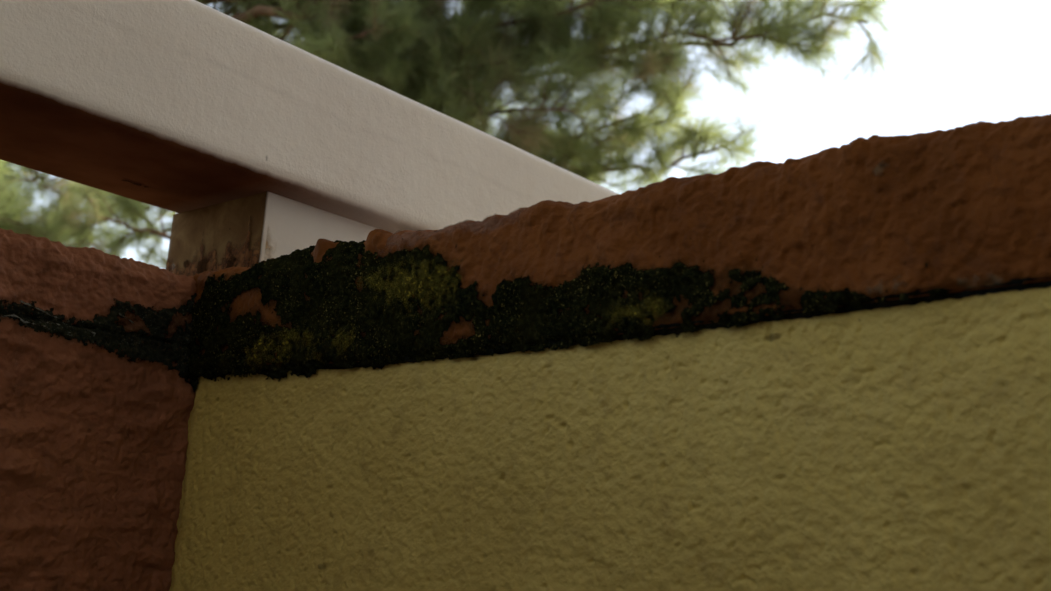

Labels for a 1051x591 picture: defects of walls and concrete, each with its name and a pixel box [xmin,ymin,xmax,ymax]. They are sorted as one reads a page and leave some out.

crack [0,293,197,384]
leakage [167,191,950,380]